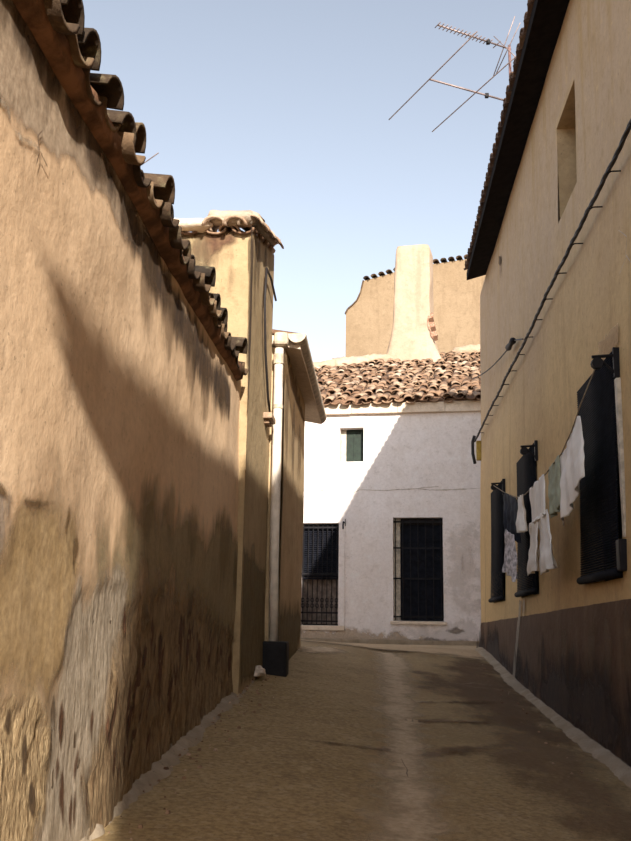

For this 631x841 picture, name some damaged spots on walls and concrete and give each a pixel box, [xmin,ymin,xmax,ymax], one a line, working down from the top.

peeling [0,0,149,240]
damp [84,525,105,612]
spalling [0,498,234,841]
damp [91,491,265,773]
damp [405,599,631,837]